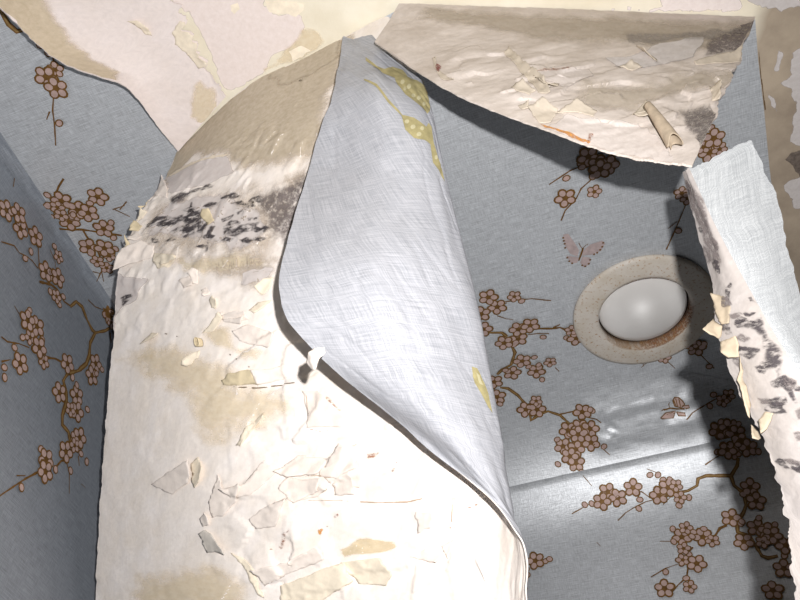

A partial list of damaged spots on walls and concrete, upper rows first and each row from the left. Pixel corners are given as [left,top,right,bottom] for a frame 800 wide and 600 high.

peeling [172,0,305,90]
peeling [606,37,743,71]
peeling [504,46,673,162]
peeling [112,154,265,330]
water stain [147,175,304,281]
mould [685,181,720,273]
water stain [142,351,280,428]
peeling [703,293,774,440]
mould [721,283,781,372]
mould [760,376,800,413]
mould [776,458,800,473]
peeling [198,443,395,600]